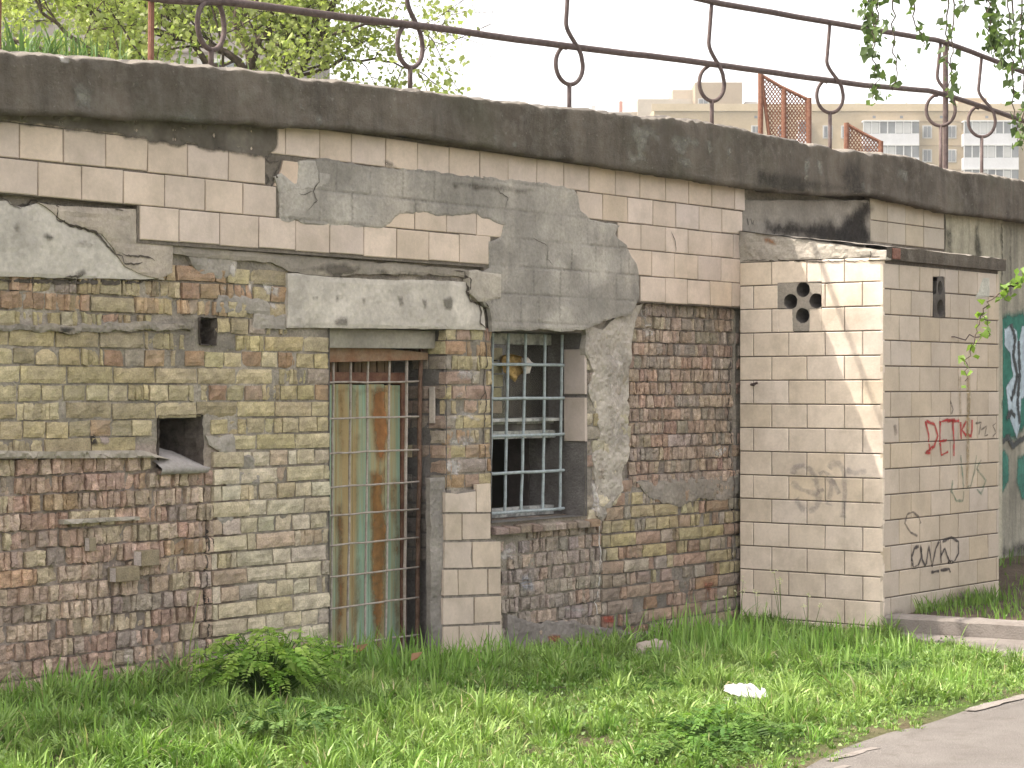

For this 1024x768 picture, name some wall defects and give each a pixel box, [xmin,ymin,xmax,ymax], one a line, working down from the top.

crack [0,197,155,285]
damp [767,203,870,244]
crack [455,270,489,475]
rust [373,390,388,459]
rust [371,473,398,645]